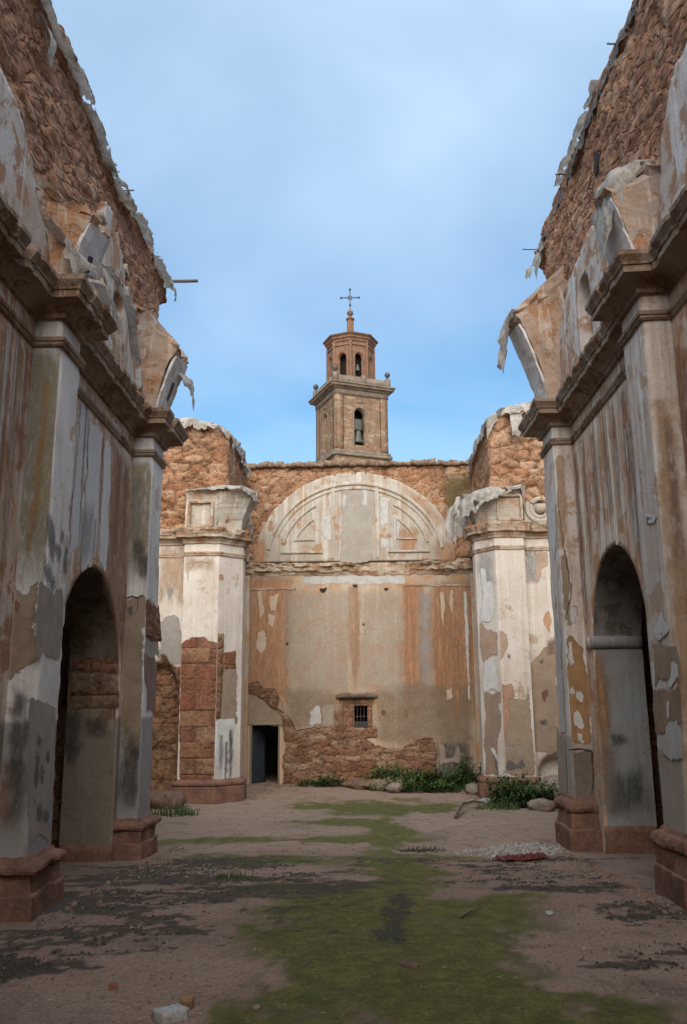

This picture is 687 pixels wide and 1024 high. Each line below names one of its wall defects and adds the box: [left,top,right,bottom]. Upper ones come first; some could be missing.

peeling [69,404,111,572]
peeling [8,579,68,680]
peeling [28,698,56,845]
spalling [69,581,437,791]
water stain [287,691,336,727]
water stain [379,595,470,778]
peeling [440,431,628,798]
peeling [652,610,683,761]